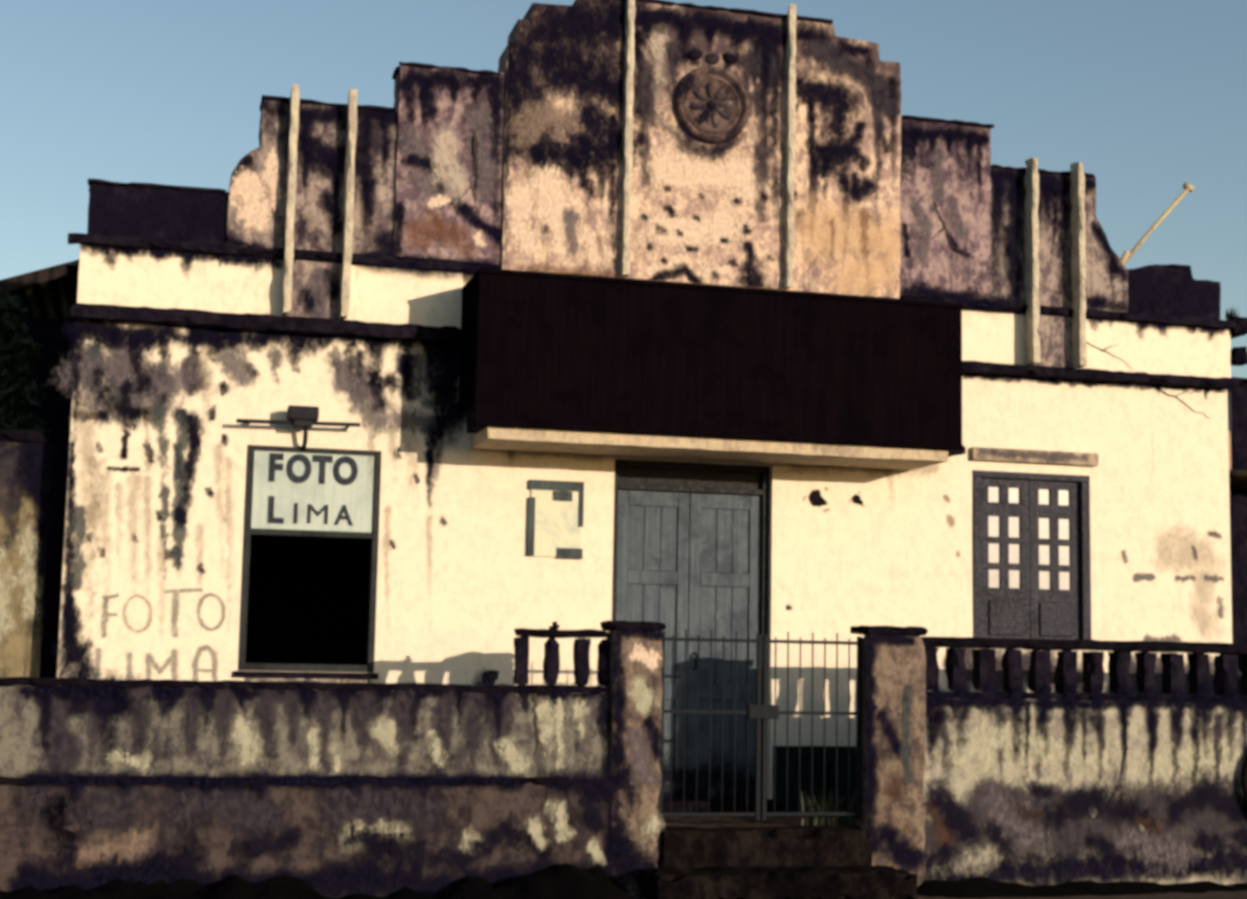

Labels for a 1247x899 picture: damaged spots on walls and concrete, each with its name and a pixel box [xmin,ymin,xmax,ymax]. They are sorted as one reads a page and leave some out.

water stain [263,0,1023,317]
water stain [1037,173,1226,338]
water stain [59,317,472,569]
water stain [0,437,755,899]
water stain [865,634,1247,886]
water stain [1122,551,1155,582]